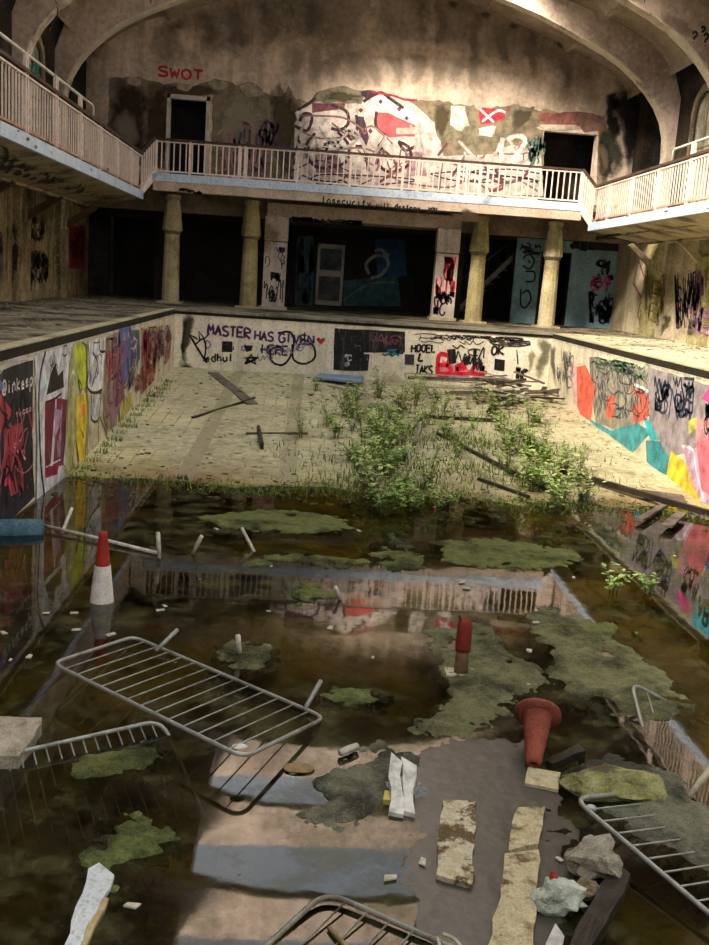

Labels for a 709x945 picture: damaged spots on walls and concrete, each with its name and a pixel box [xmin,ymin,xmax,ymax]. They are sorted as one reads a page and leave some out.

flaking render [107,76,373,182]
water stain [598,89,641,180]